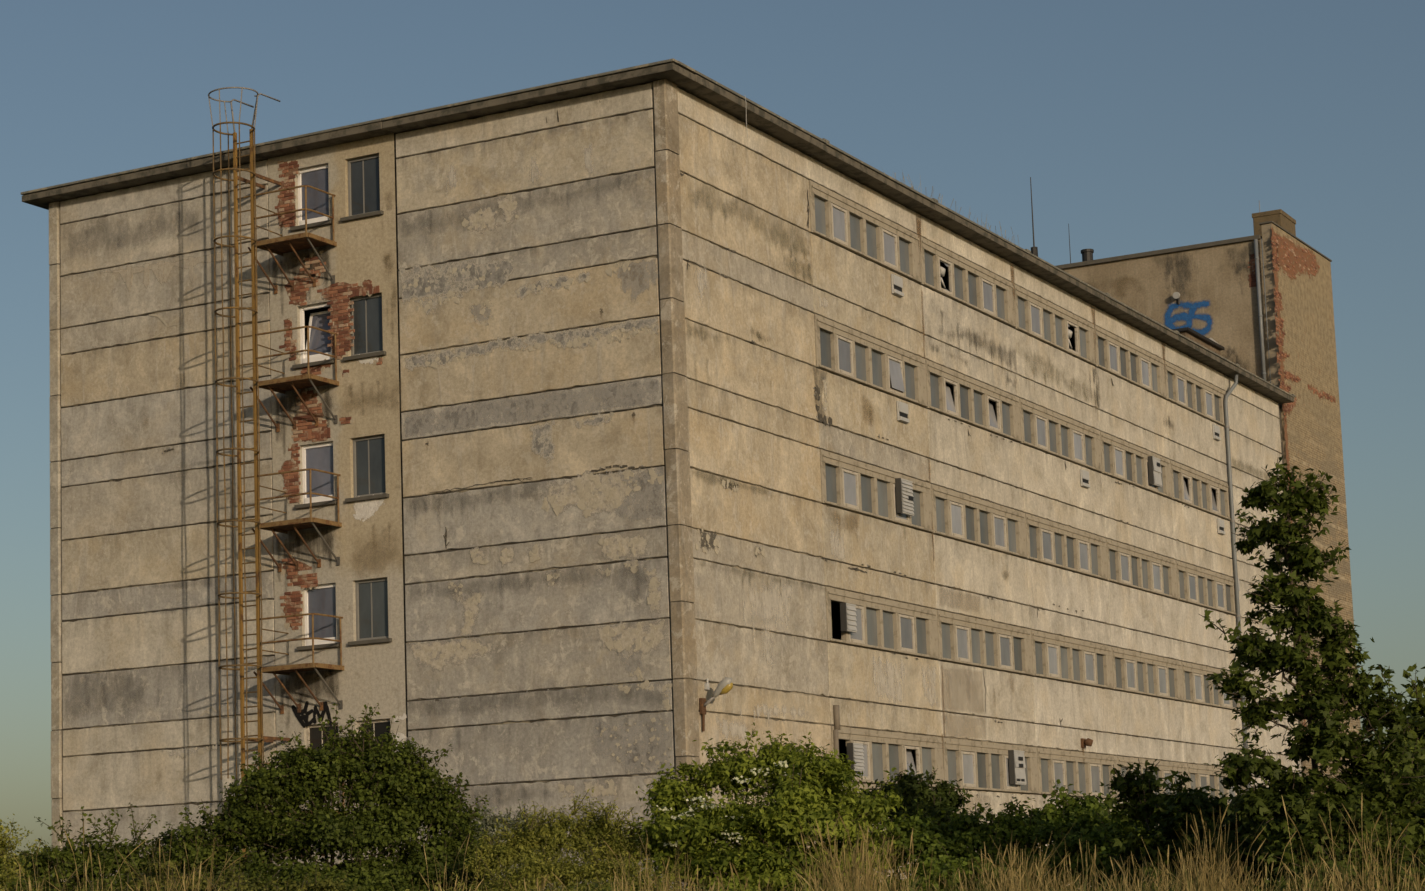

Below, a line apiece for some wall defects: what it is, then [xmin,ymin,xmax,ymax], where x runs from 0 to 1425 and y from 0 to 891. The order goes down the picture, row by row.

flaking render [275,157,301,229]
flaking render [278,250,383,504]
flaking render [1247,227,1336,490]
peeling [353,494,385,522]